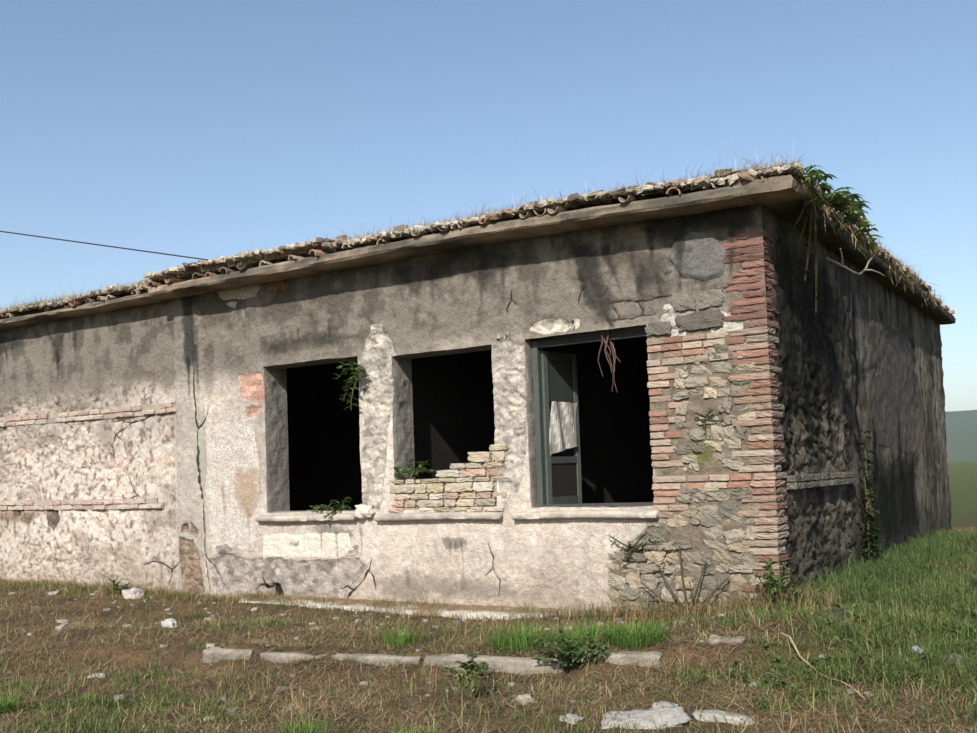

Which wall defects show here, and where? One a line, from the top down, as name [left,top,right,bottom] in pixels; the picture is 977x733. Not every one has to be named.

damp [182,295,198,385]
damp [573,245,612,324]
crack [578,262,672,326]
damp [776,257,872,427]
crack [111,415,152,511]
crack [190,311,224,589]
peeling [179,372,367,598]
flaking render [361,324,397,511]
flaking render [492,318,580,507]
damp [870,418,919,543]
crack [339,561,376,599]
flaking render [622,535,676,613]